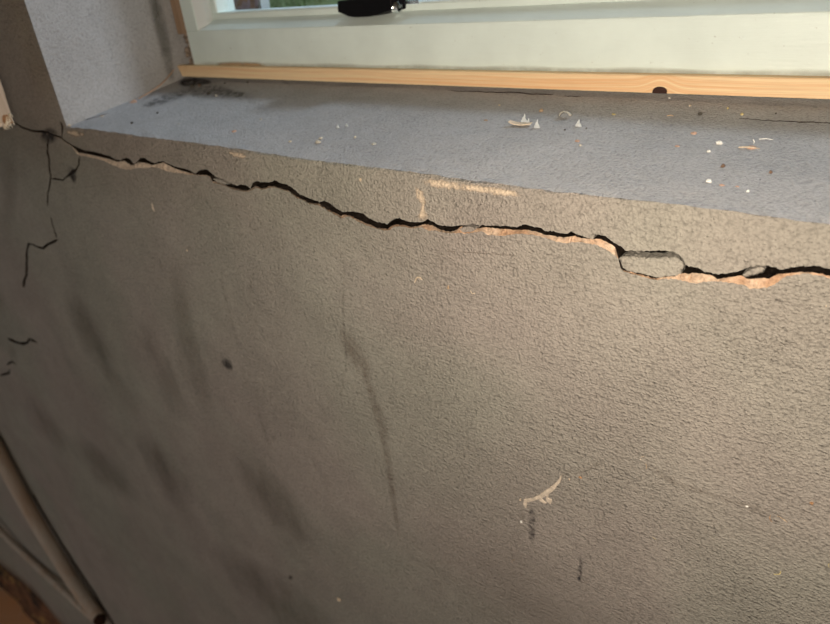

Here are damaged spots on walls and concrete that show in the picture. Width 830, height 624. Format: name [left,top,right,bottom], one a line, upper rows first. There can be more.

crack [738,117,830,125]
crack [13,121,830,289]
crack [0,338,37,376]
crack [33,493,114,624]